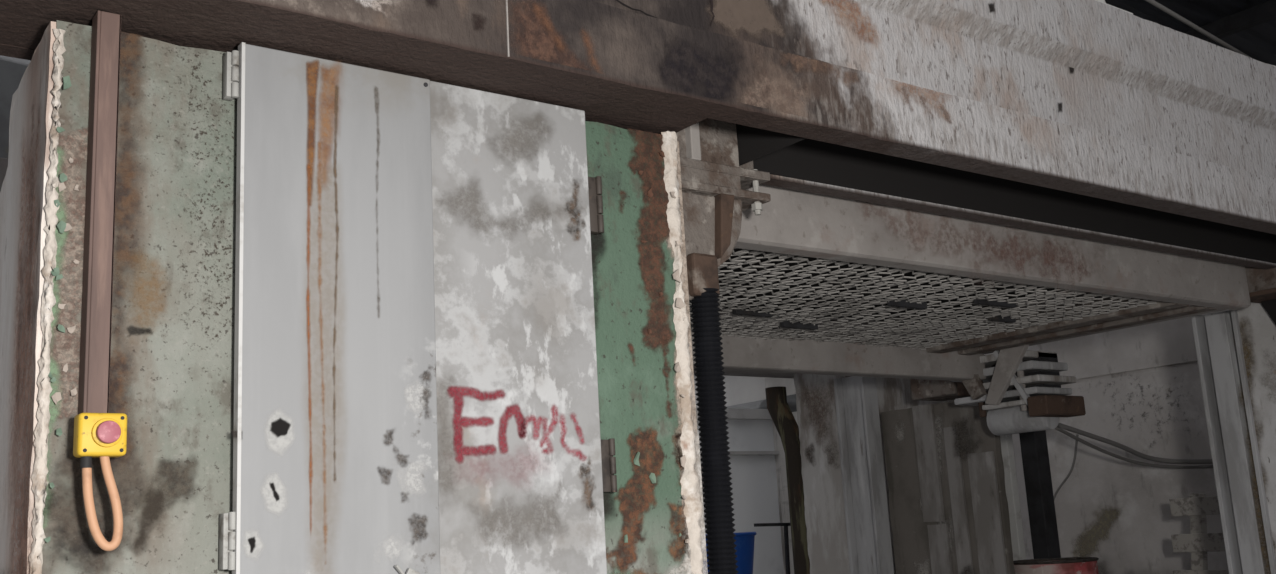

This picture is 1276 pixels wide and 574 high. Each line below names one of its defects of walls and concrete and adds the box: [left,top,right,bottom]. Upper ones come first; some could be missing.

peeling [29,29,88,574]
rust [307,61,339,504]
spalling [661,131,708,574]